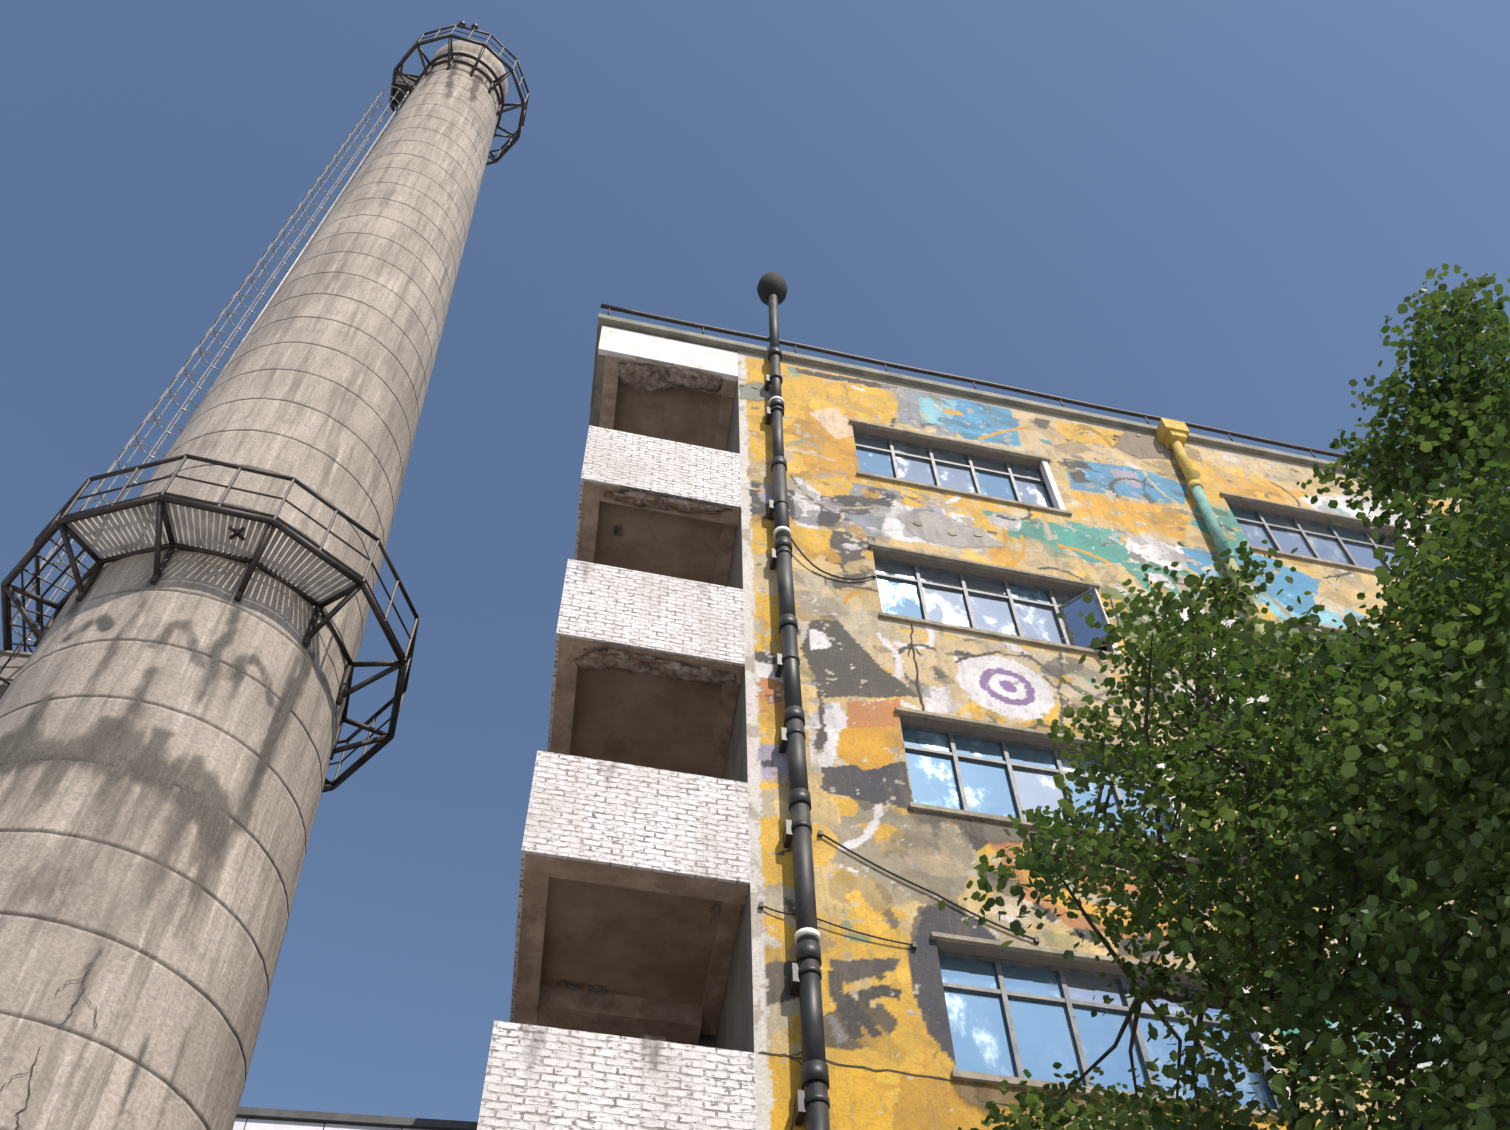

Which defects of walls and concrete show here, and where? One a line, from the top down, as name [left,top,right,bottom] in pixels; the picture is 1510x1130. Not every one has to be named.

spalling [618,362,771,401]
spalling [604,489,733,514]
spalling [573,648,736,685]
leakage [0,606,315,900]
crack [1,961,97,1130]